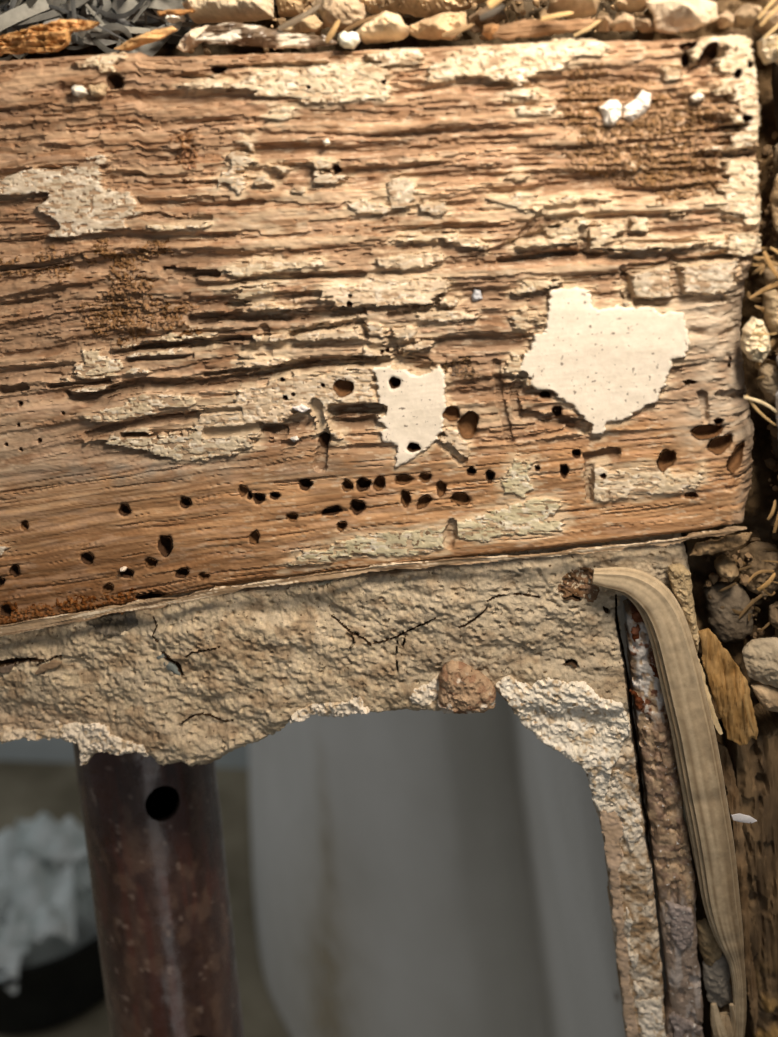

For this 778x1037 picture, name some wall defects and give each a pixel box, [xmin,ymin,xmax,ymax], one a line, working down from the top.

peeling [0,155,212,237]
peeling [505,34,762,434]
peeling [222,260,325,311]
peeling [252,233,489,352]
peeling [65,333,215,392]
peeling [83,348,469,467]
crack [0,655,62,667]
crack [152,616,220,677]
crack [331,615,436,672]
corrosion [631,611,643,642]
crack [181,712,234,724]
crack [459,592,651,856]